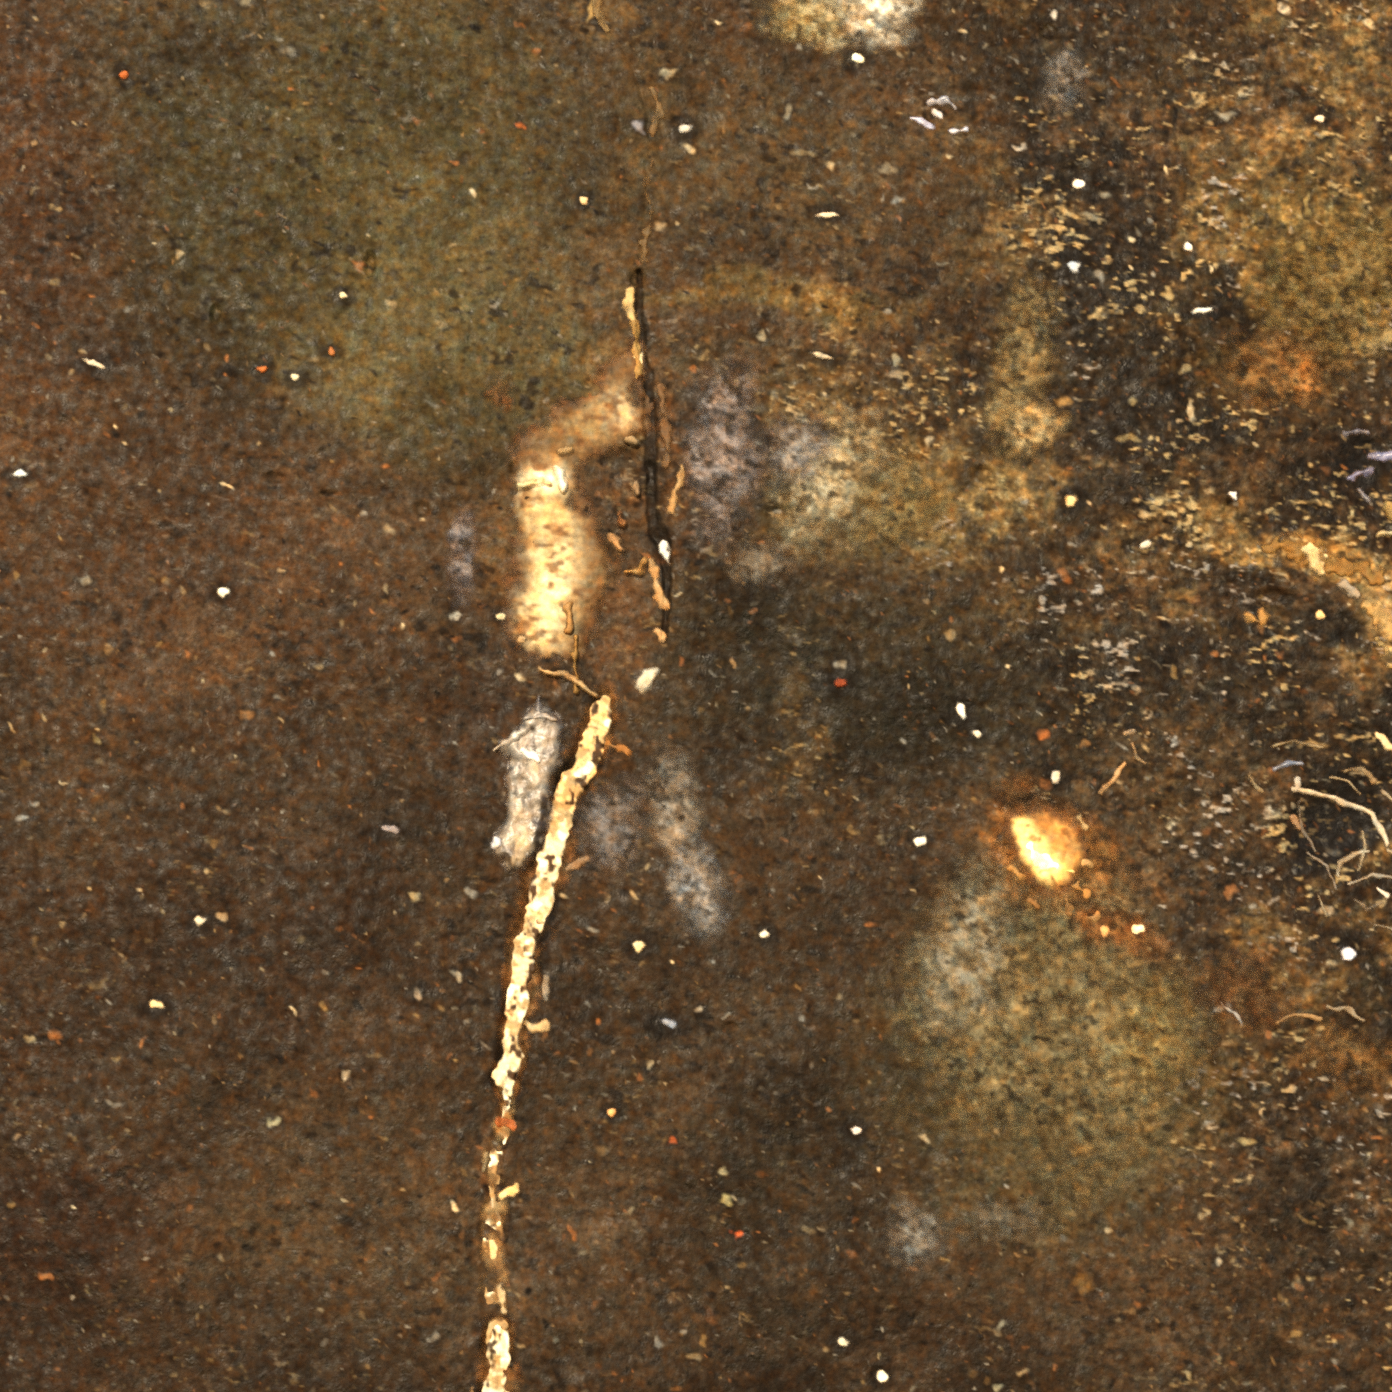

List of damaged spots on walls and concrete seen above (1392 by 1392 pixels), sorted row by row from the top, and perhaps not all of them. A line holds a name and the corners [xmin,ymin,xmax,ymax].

crack [592,0,610,33]
crack [470,86,684,1392]
corrosion [1072,833,1114,884]
corrosion [1079,910,1144,943]
damp [916,888,1169,1168]
damp [981,1202,1037,1232]
damp [899,1218,935,1260]